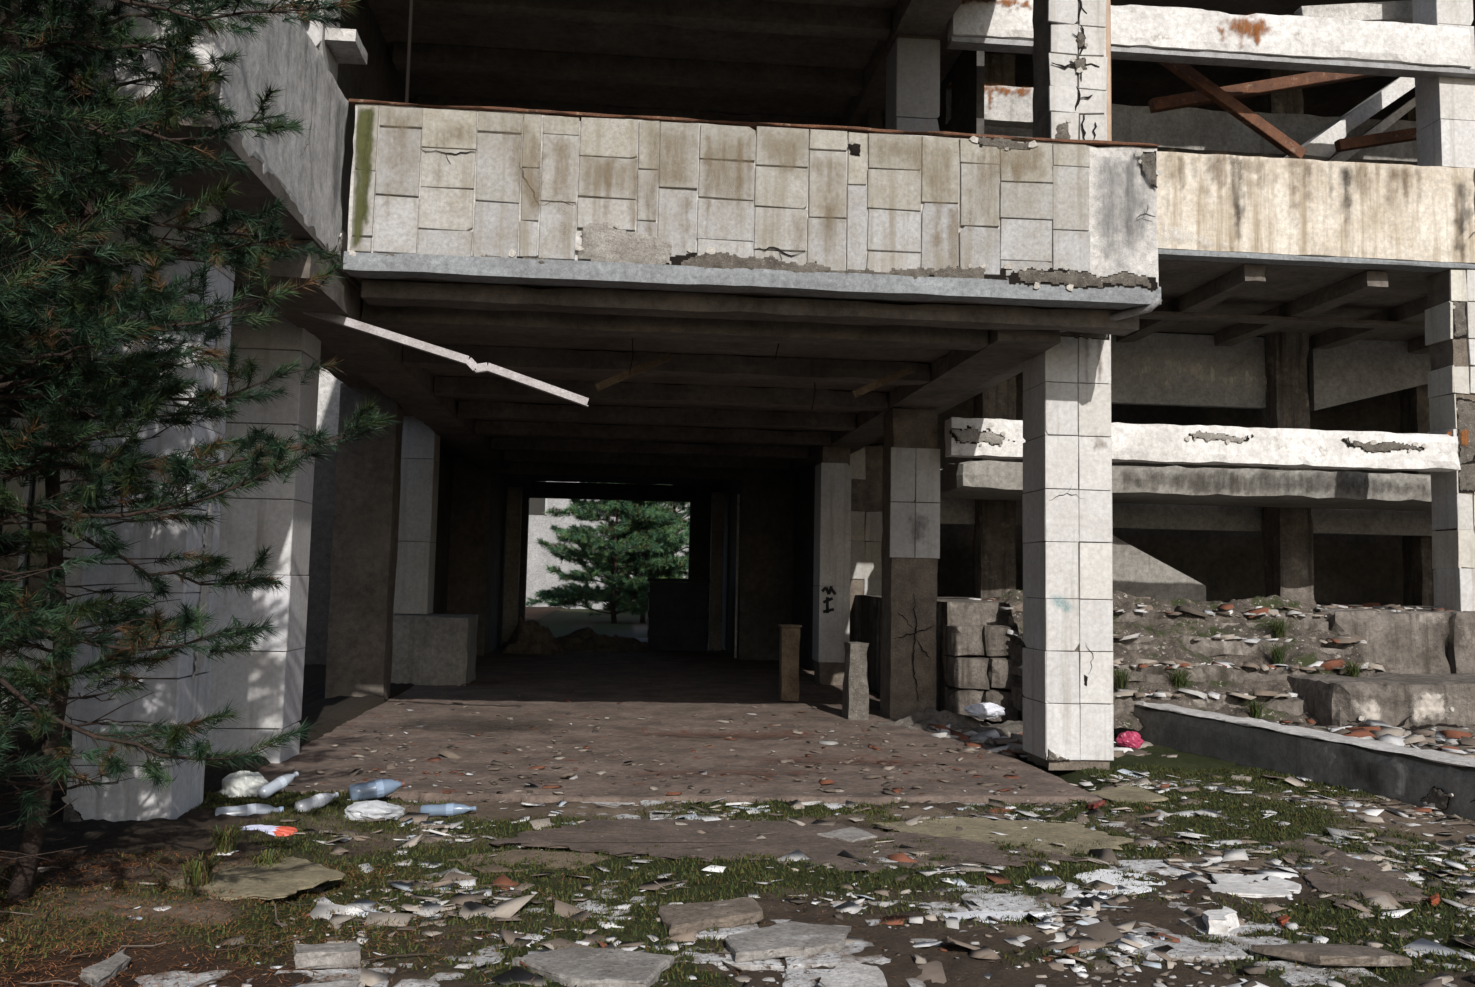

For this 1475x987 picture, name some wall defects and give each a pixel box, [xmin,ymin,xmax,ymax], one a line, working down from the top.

rust [1218,19,1268,45]
crack [1052,0,1100,140]
damp [363,112,373,223]
spalling [575,222,1158,292]
peeling [949,425,1015,446]
peeling [1185,430,1254,444]
peeling [1341,437,1427,453]
spalling [1454,397,1475,495]
crack [893,593,933,696]